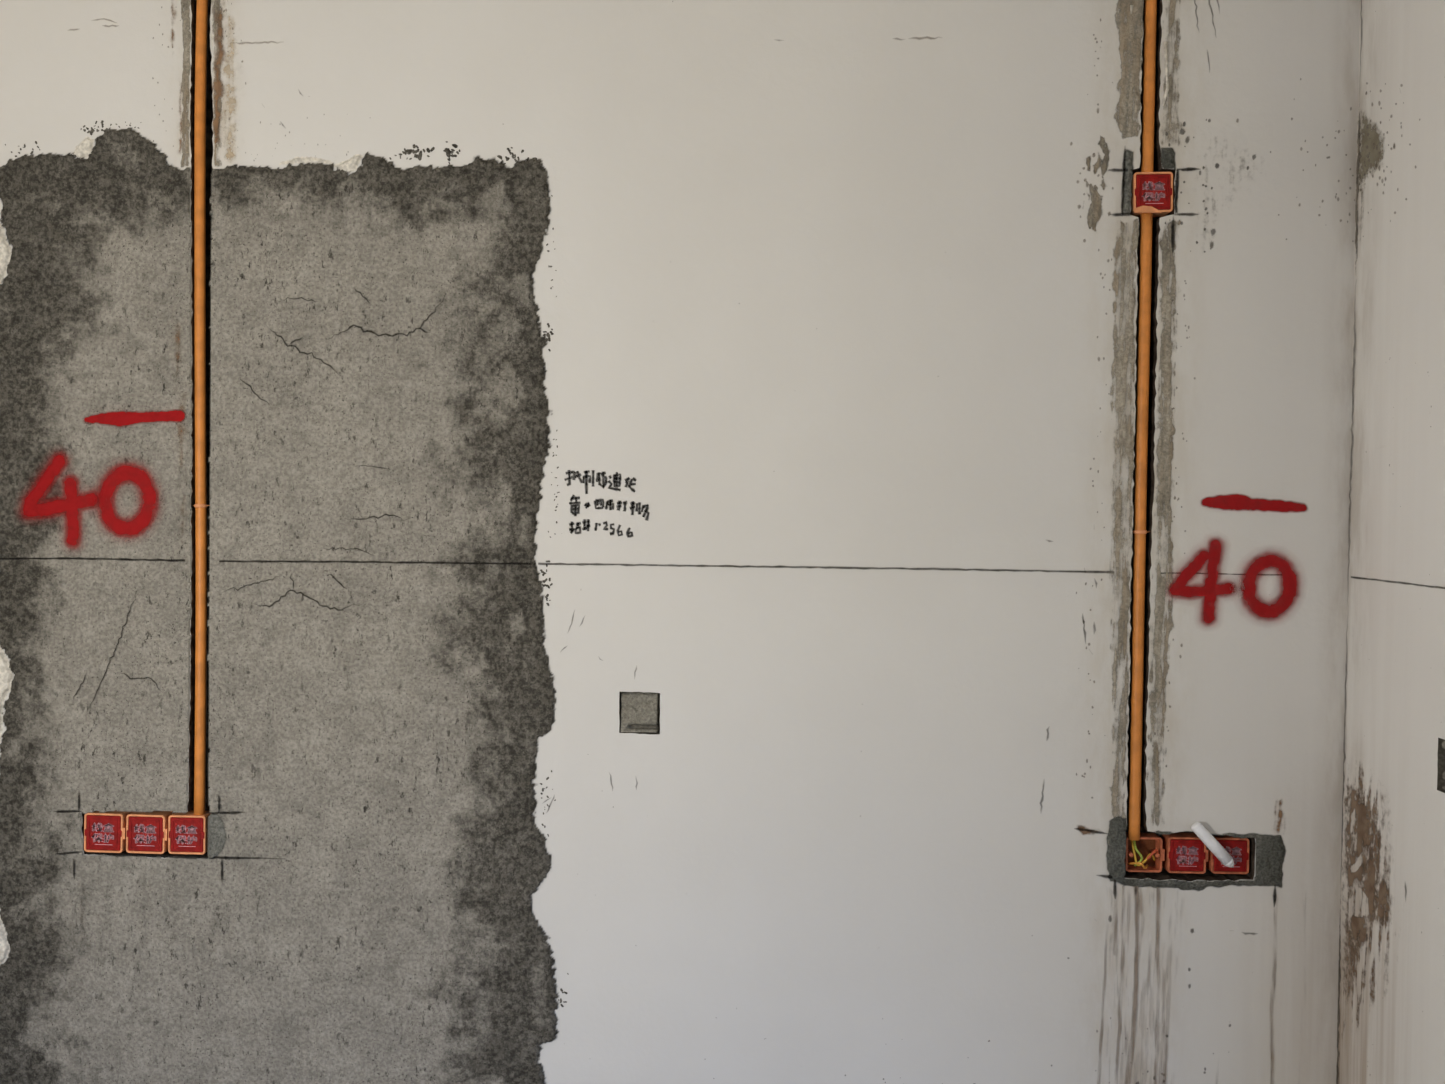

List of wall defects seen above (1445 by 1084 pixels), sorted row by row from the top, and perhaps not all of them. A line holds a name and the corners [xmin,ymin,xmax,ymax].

flaking render [72,137,94,159]
flaking render [279,154,363,172]
flaking render [0,223,12,284]
crack [271,290,436,370]
crack [226,514,401,611]
flaking render [0,647,14,739]
flaking render [0,916,10,965]